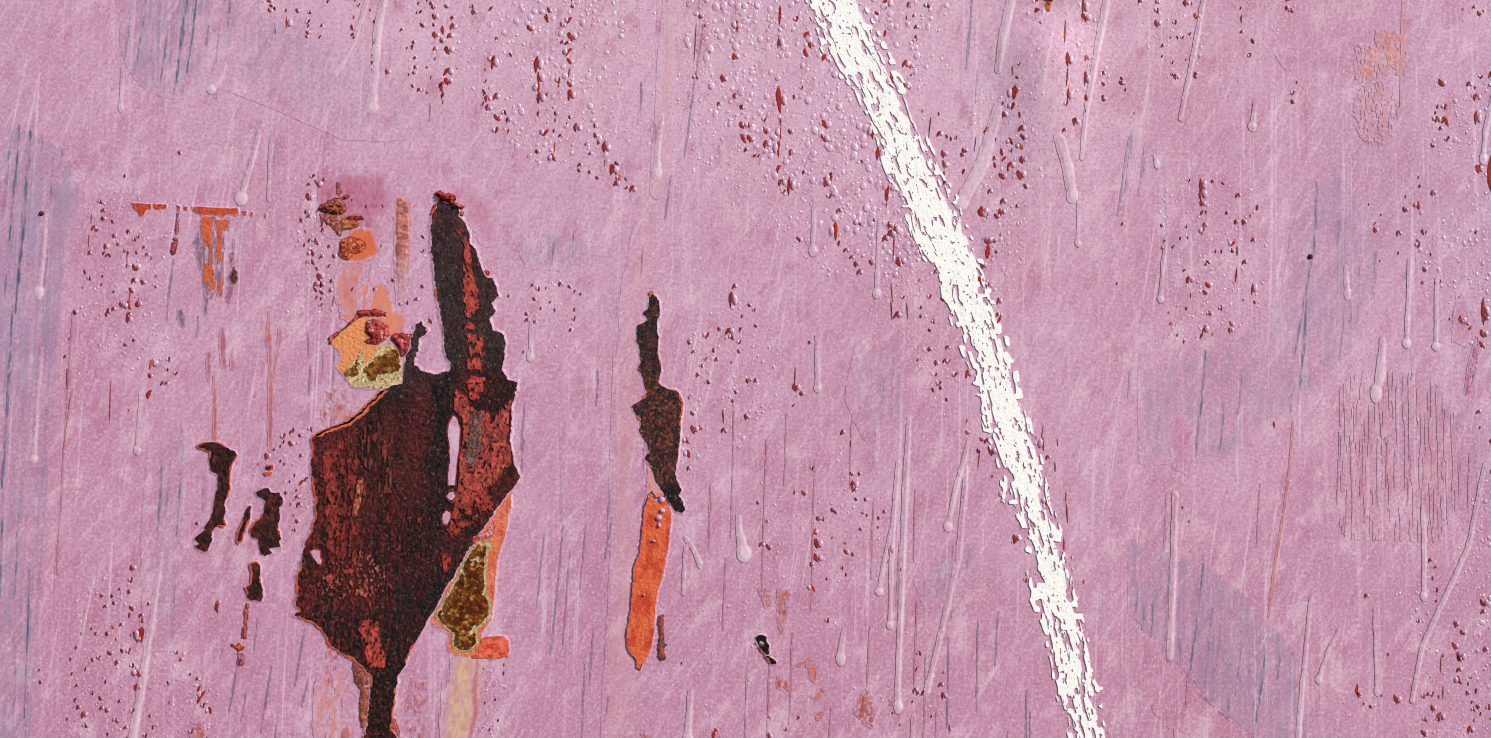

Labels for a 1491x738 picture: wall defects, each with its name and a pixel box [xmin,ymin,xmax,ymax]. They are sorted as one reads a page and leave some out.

rust [226,238,239,303]
spalling [262,0,324,39]
rust [316,165,401,315]
peeling [187,174,581,738]
rust [600,215,657,738]
spalling [350,0,1007,503]
peeling [624,284,834,738]
spalling [757,429,952,738]